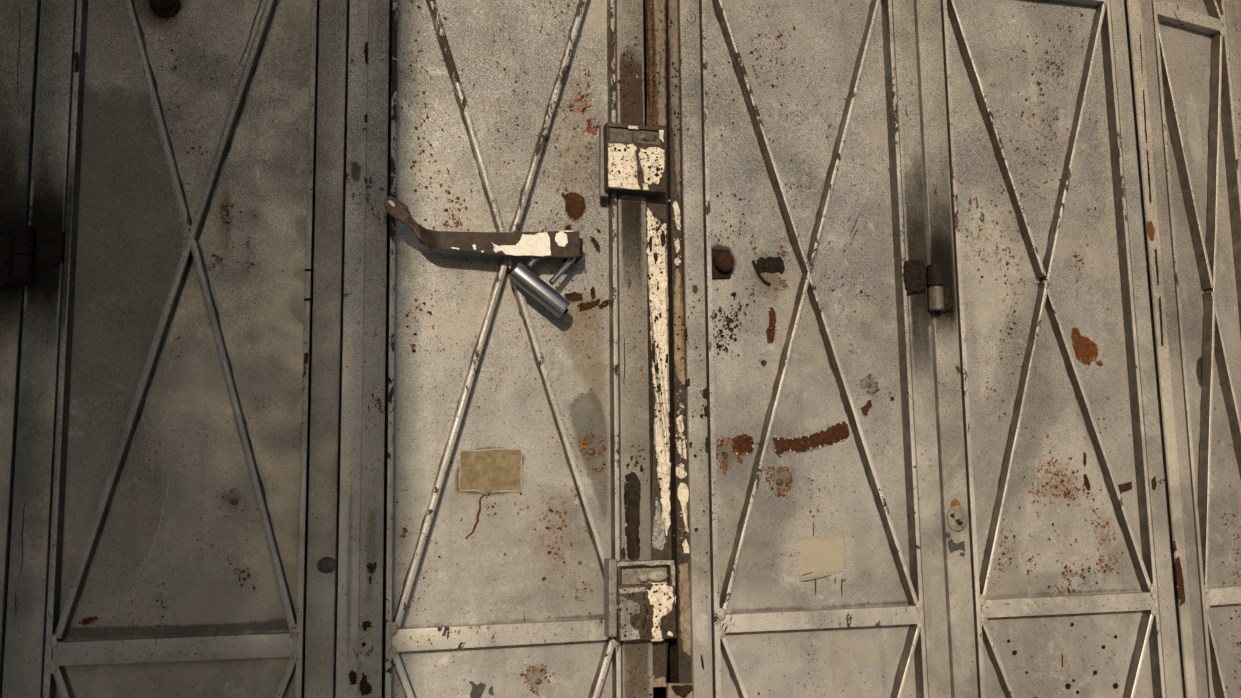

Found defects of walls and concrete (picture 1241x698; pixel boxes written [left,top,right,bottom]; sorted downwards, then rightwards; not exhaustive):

rust [397,0,609,407]
rust [617,0,669,126]
peeling [621,0,709,669]
rust [709,61,794,369]
rust [748,4,890,216]
rust [965,5,1132,594]
rust [399,485,603,614]
rust [692,420,856,537]
peeling [469,681,493,698]
rust [520,664,555,696]